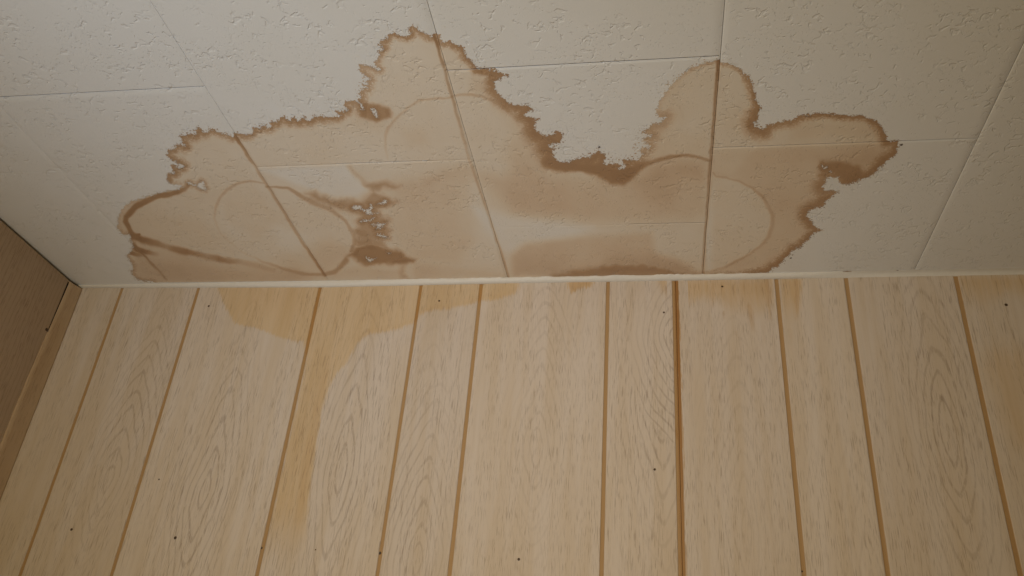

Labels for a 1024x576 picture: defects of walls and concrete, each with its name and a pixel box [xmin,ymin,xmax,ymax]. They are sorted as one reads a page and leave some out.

water stain [117,24,900,570]